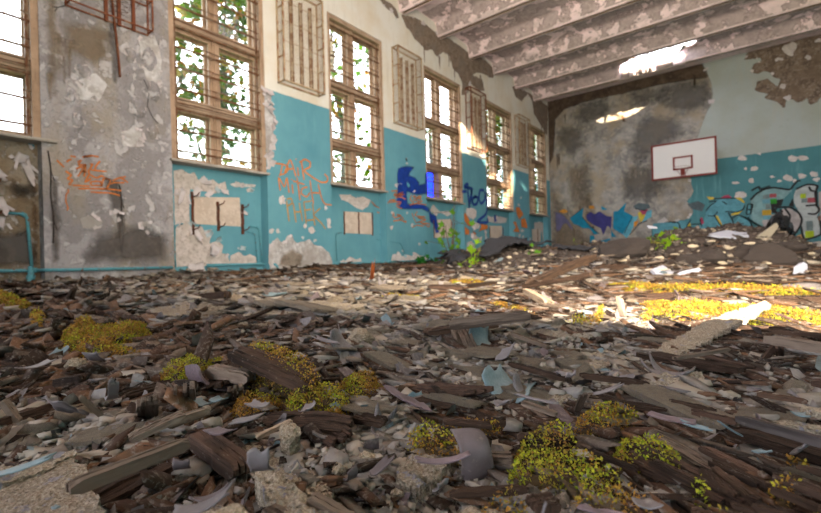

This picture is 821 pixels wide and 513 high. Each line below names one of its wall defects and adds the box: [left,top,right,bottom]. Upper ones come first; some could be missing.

peeling [137,35,163,89]
peeling [75,73,107,102]
peeling [121,126,146,148]
peeling [261,85,278,170]
spalling [381,0,821,249]
peeling [8,143,39,187]
peeling [0,196,15,230]
peeling [80,209,127,230]
peeling [137,220,162,236]
peeling [173,169,257,271]
peeling [339,194,372,234]
spalling [268,223,362,282]